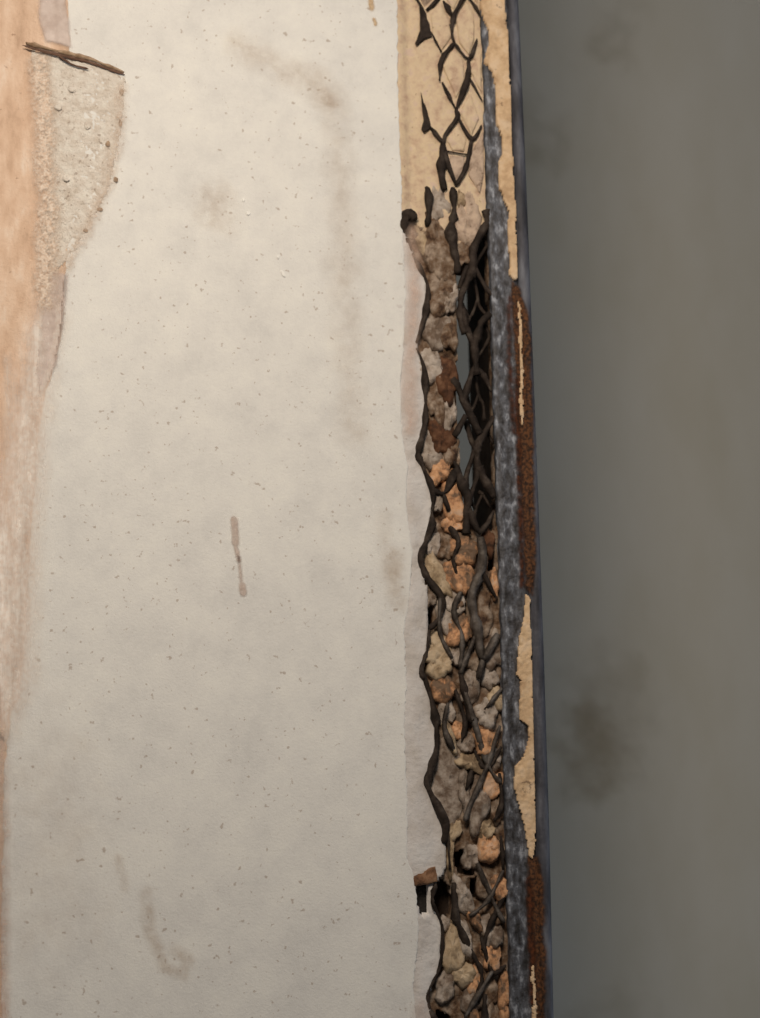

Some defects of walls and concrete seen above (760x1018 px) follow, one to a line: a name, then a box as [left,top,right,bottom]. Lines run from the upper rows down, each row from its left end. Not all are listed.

spalling [0,0,126,547]
spalling [395,0,509,1018]
corrosion [507,283,536,593]
spalling [0,695,12,1018]
corrosion [526,856,546,1018]